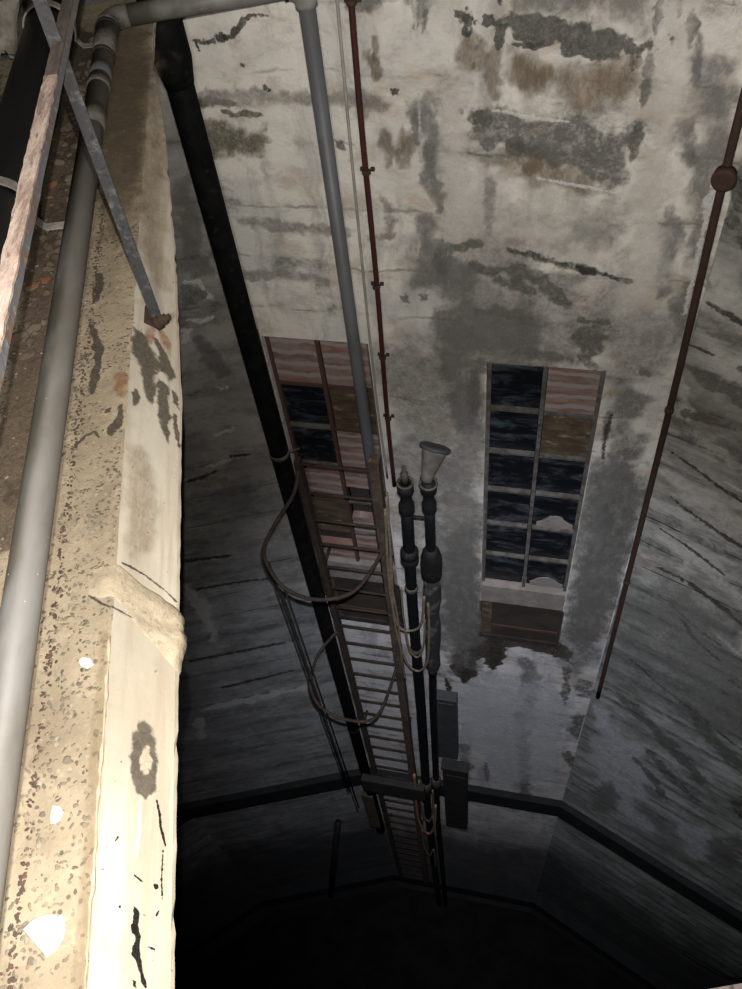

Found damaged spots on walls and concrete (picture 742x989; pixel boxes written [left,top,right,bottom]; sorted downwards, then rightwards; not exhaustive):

damp [383,0,742,799]
damp [129,722,158,857]
crack [131,800,166,988]